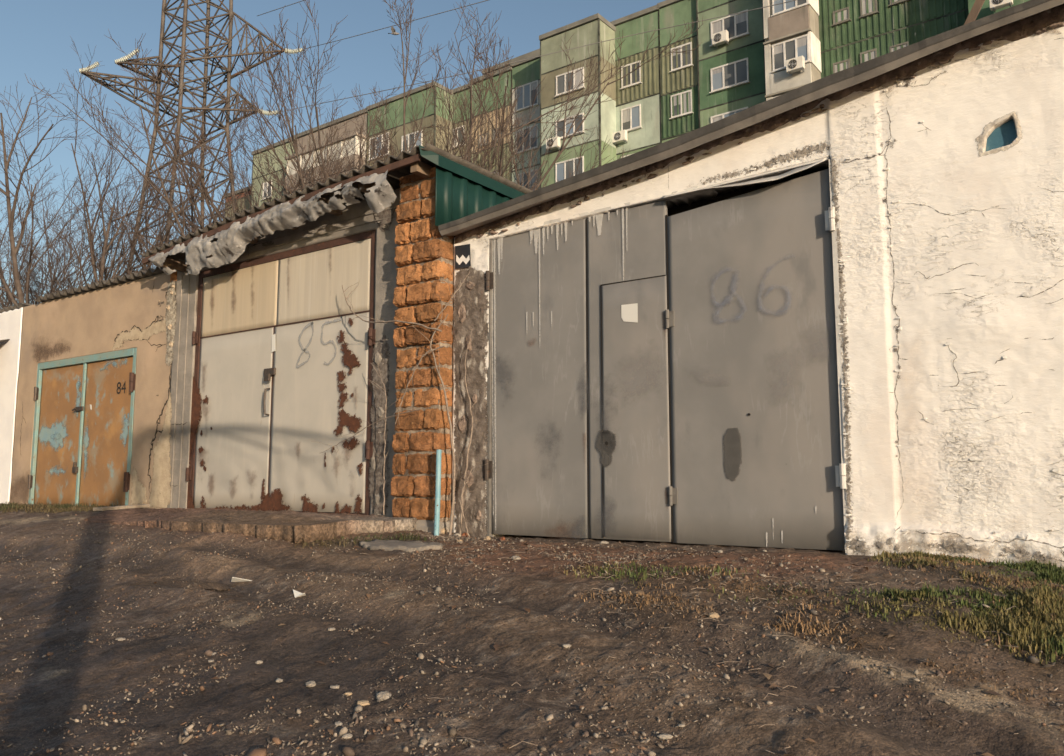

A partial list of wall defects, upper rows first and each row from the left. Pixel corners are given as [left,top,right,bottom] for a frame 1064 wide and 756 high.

peeling [39,422,67,450]
spalling [101,281,177,370]
crack [114,279,187,492]
corrosion [187,376,362,514]
corrosion [324,318,362,467]
damp [526,220,573,341]
damp [608,207,627,281]
crack [843,59,1064,562]
spalling [929,540,980,555]
spalling [999,547,1052,562]